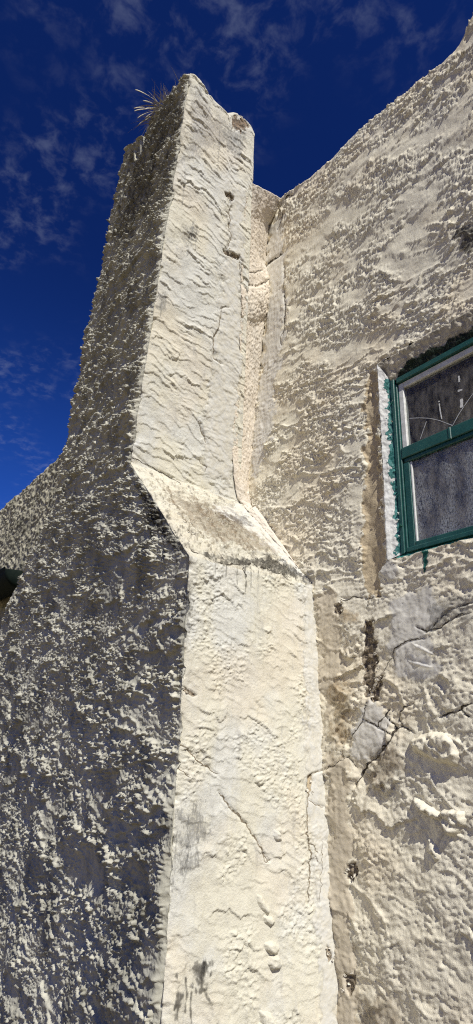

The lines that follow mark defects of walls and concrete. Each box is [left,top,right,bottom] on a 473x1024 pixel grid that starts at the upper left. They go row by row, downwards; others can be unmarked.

crack [383,603,472,672]
crack [442,703,471,718]
crack [305,703,413,897]
leakage [174,961,211,1016]